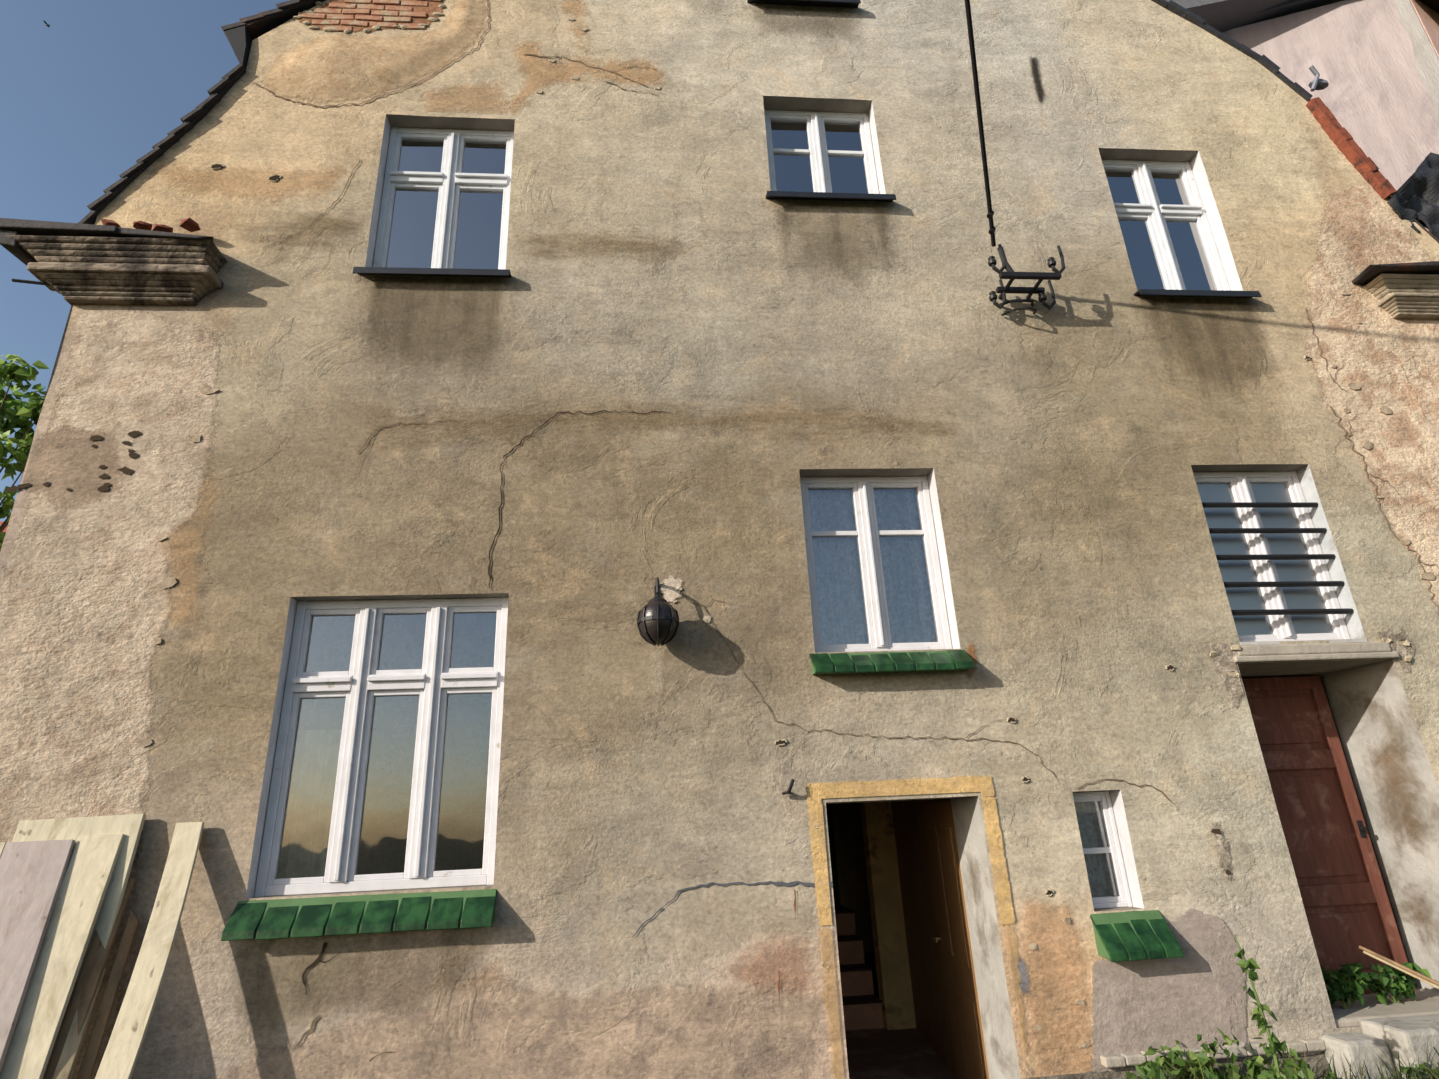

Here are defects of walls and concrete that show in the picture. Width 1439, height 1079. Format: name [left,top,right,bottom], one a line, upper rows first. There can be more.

flaking render [293,0,446,34]
peeling [0,305,220,843]
crack [340,420,457,489]
crack [488,410,670,588]
flaking render [660,575,683,603]
crack [680,593,1178,810]
peeling [1304,183,1439,615]
crack [1305,308,1439,608]
spalling [1378,628,1416,672]
peeling [72,838,142,1079]
crack [294,942,342,1050]
crack [627,881,833,945]